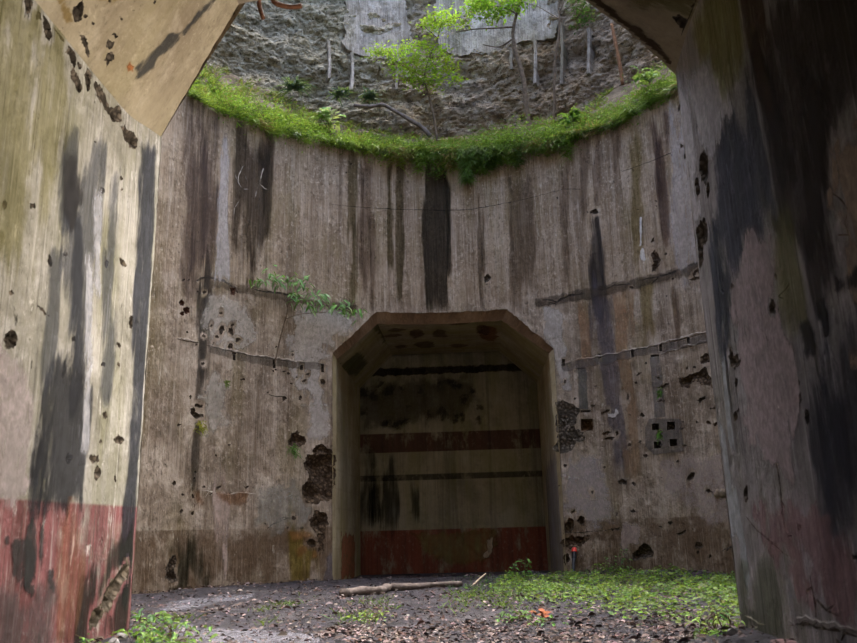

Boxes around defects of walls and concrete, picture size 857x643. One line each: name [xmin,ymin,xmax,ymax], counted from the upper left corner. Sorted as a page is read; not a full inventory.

leakage [423,170,451,304]
spalling [655,353,717,427]
spalling [552,398,588,473]
spalling [286,430,337,552]
spalling [88,558,129,630]
spalling [165,554,177,583]